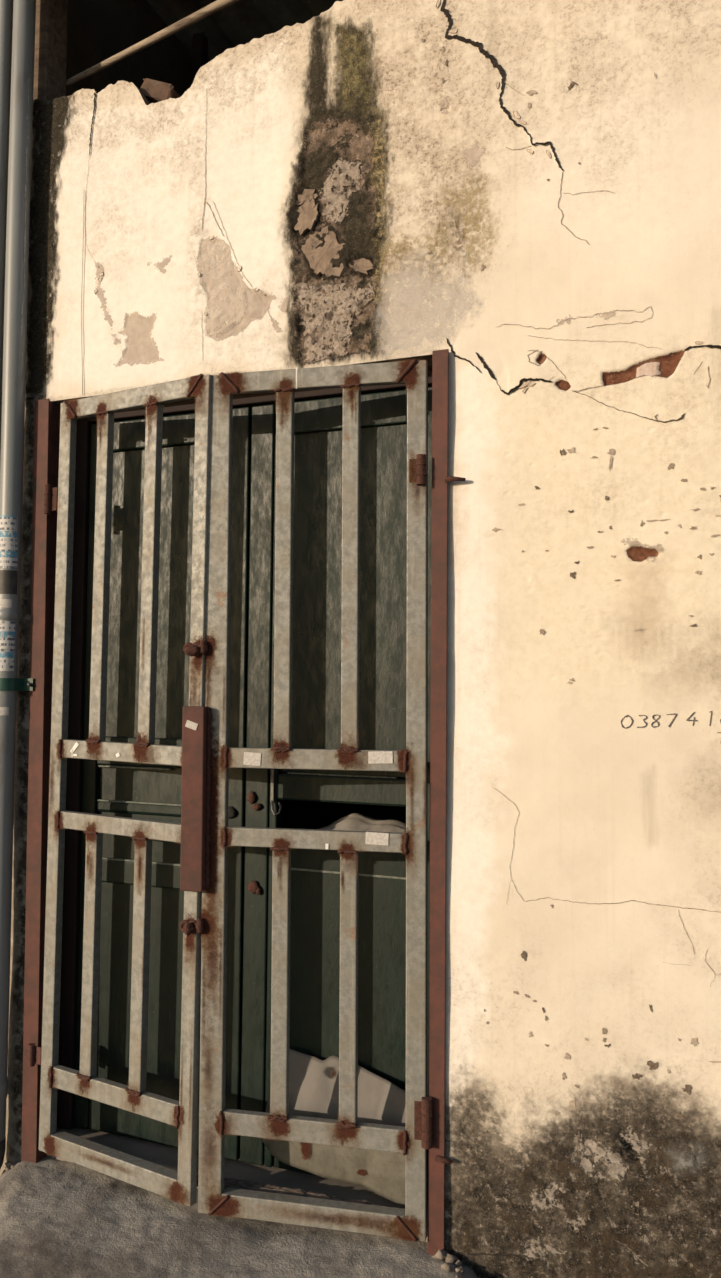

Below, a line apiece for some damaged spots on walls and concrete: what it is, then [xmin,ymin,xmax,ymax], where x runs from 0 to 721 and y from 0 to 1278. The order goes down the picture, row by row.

flaking render [197,116,378,366]
damp [283,16,390,368]
crack [436,0,613,245]
crack [446,306,721,423]
flaking render [602,350,685,386]
damp [12,94,74,1151]
corrosion [190,636,216,705]
spalling [621,522,664,562]
corrosion [185,727,232,1016]
crack [492,787,721,986]
corrosion [301,1213,420,1242]
damp [445,1087,721,1278]